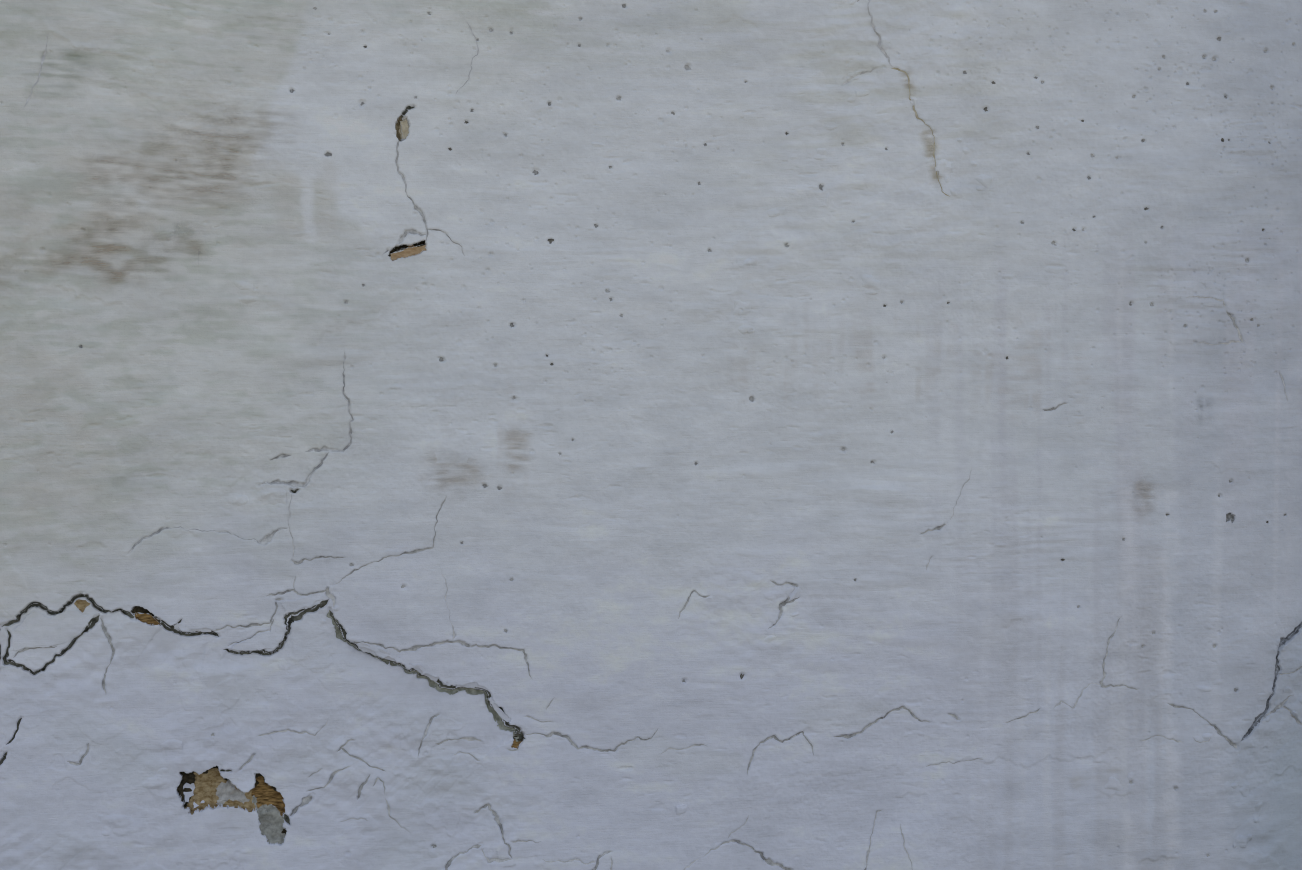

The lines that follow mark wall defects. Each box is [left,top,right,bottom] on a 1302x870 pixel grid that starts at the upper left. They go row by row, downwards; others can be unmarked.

flaking render [395,115,409,141]
flaking render [388,240,426,261]
crack [0,352,708,765]
crack [1142,622,1302,749]
crack [747,706,960,774]
flaking render [177,766,287,845]
crack [220,723,409,832]
crack [445,804,613,870]
crack [684,816,792,870]
crack [864,810,912,870]